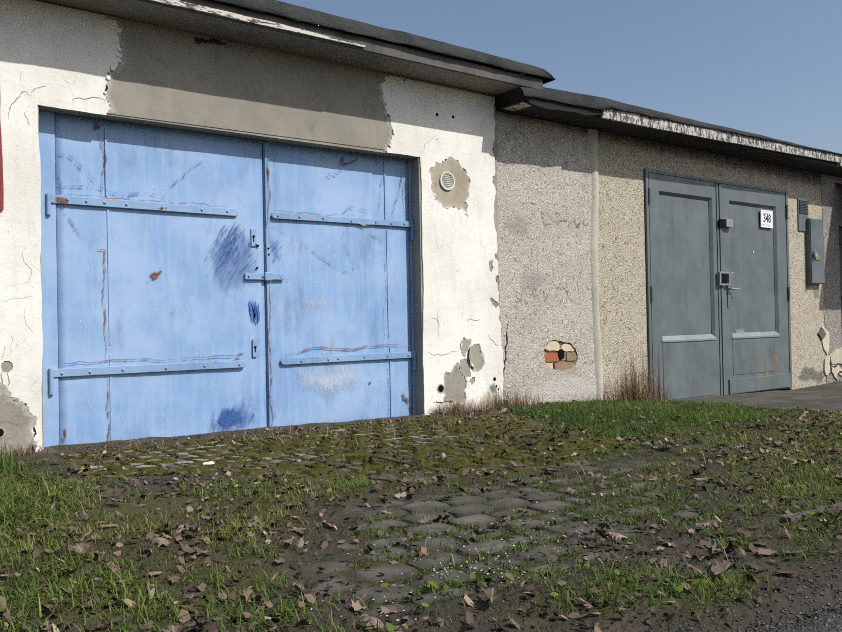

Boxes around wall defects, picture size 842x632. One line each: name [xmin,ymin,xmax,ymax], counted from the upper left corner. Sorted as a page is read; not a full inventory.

flaking render [443,337,485,404]
flaking render [544,340,577,371]
flaking render [821,326,842,381]